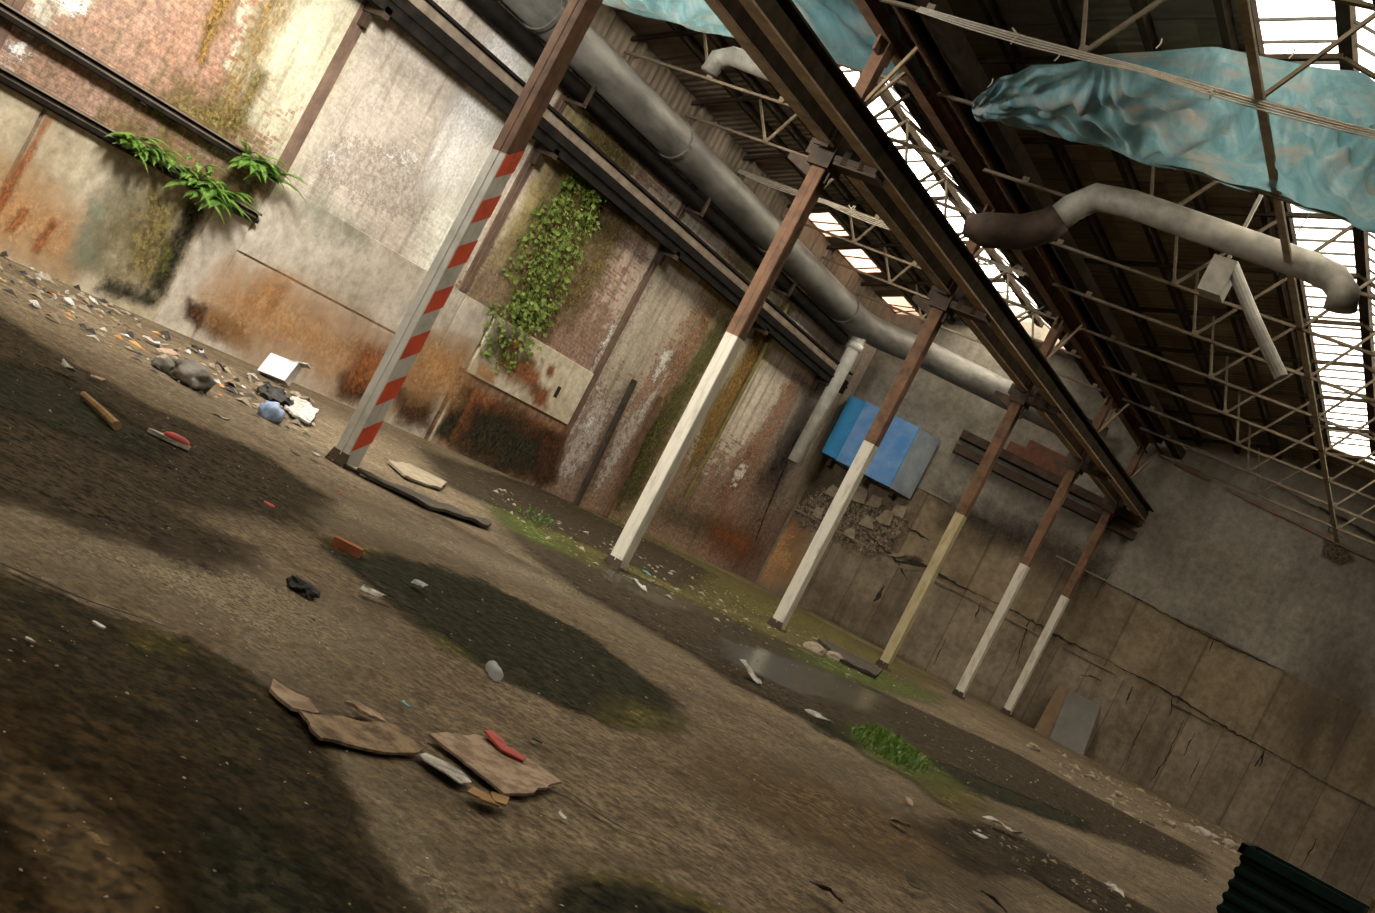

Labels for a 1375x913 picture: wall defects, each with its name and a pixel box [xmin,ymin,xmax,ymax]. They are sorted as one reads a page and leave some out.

peeling [51,0,89,18]
water stain [159,0,292,137]
corrosion [0,119,72,261]
water stain [100,281,158,305]
water stain [186,298,249,344]
corrosion [210,281,385,388]
corrosion [393,339,565,481]
peeling [557,255,673,498]
water stain [688,332,769,472]
water stain [0,316,687,732]
spalling [794,483,922,570]
crack [862,527,1309,839]